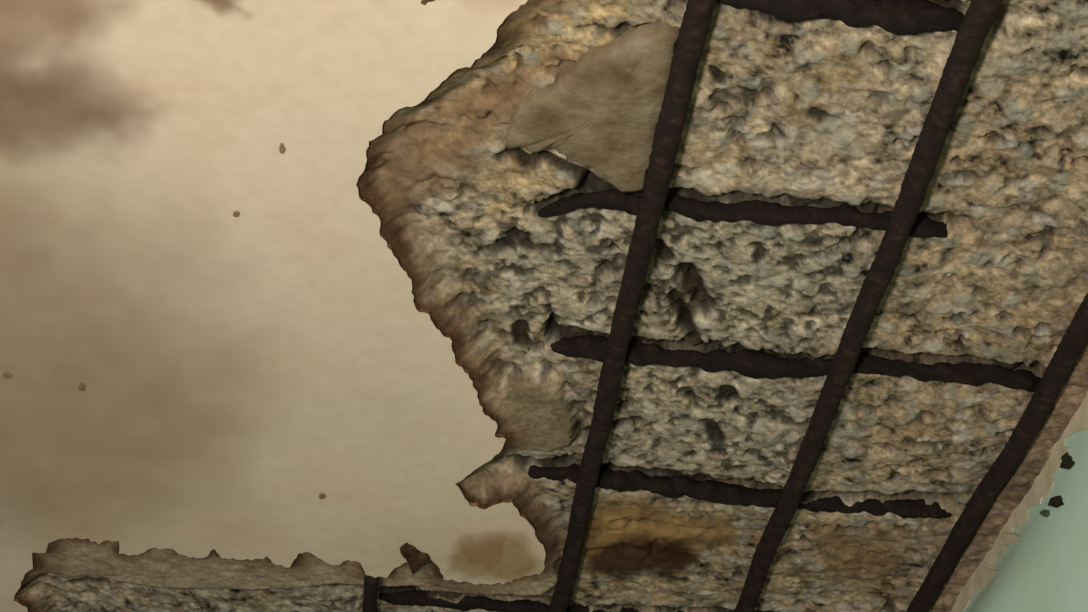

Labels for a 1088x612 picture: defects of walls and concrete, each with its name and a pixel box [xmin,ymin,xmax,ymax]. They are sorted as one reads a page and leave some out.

water stain [0,72,113,135]
spalling [667,2,957,213]
spalling [861,0,1088,378]
spalling [357,0,688,612]
spalling [629,211,885,361]
spalling [15,538,366,612]
rust [455,539,533,579]
rust [584,503,732,578]
spalling [569,487,775,612]
spalling [600,362,827,489]
spalling [754,373,1034,612]
peeling [948,392,1088,612]